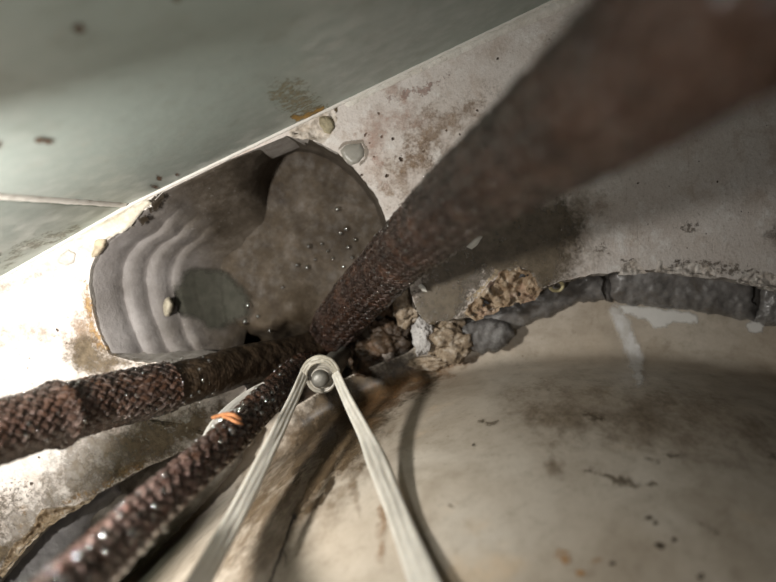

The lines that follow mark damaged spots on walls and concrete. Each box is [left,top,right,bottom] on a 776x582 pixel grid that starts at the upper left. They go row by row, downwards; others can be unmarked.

corrosion [291,106,324,122]
corrosion [386,81,440,103]
corrosion [390,102,476,193]
water stain [0,400,225,567]
crack [269,514,296,582]